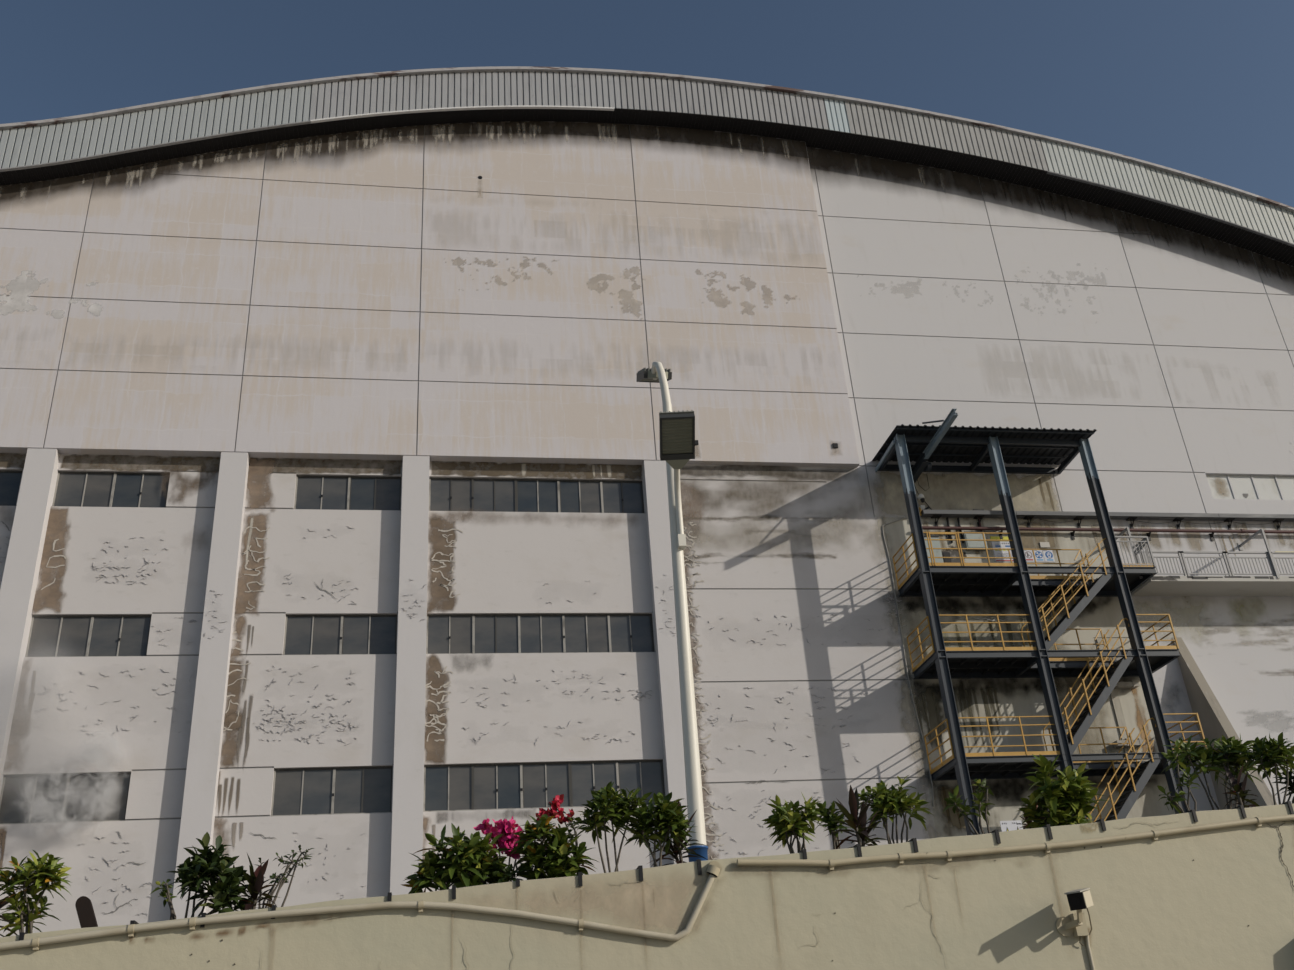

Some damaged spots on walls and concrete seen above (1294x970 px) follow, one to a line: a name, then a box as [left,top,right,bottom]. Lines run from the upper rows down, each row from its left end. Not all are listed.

water stain [0,120,1294,283]
crack [41,539,66,590]
crack [431,529,463,598]
water stain [680,465,839,677]
crack [223,526,270,731]
crack [425,666,453,741]
water stain [699,746,715,860]
crack [1268,823,1294,887]